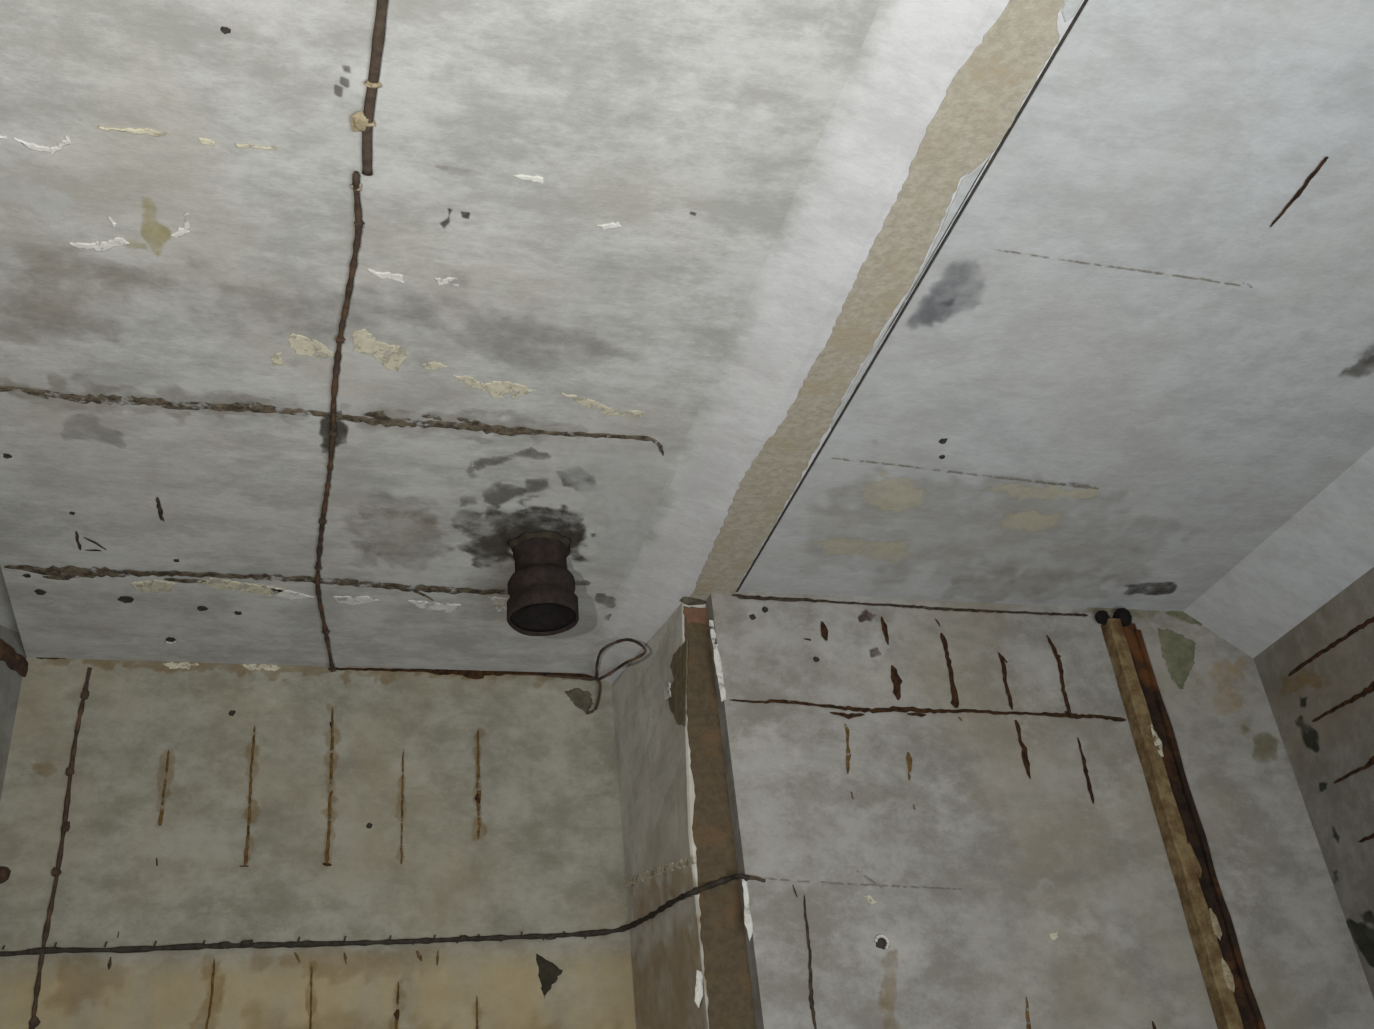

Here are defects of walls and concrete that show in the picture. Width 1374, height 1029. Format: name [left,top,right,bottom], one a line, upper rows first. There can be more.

flaking render [1062,0,1083,22]
peeling [69,216,130,251]
peeling [368,269,405,283]
flaking render [831,153,992,429]
peeling [271,333,335,366]
rust [858,611,889,656]
rust [891,665,903,700]
rust [935,619,962,721]
rust [1046,635,1071,712]
rust [998,652,1031,779]
rust [1078,738,1094,804]
damp [1346,911,1374,967]